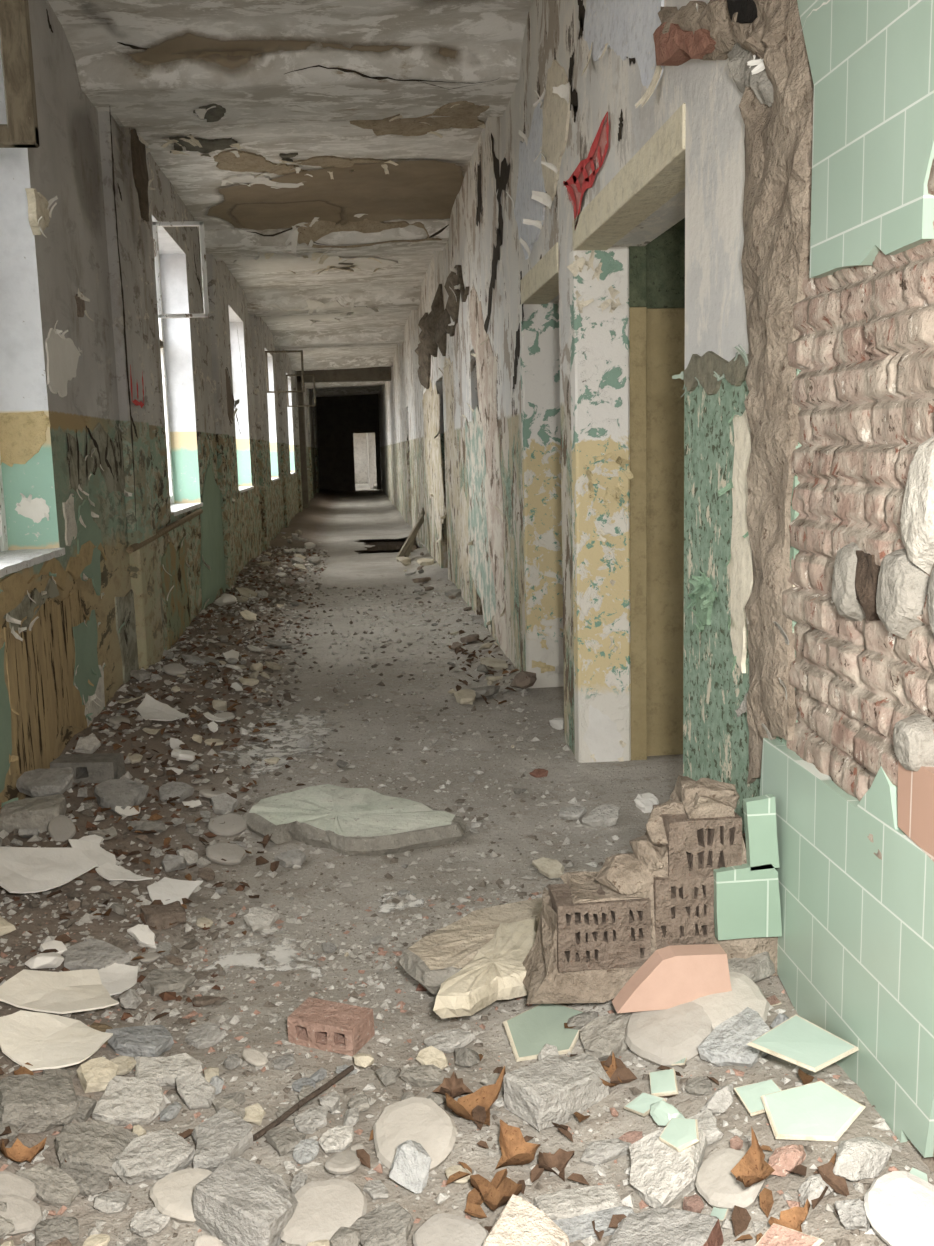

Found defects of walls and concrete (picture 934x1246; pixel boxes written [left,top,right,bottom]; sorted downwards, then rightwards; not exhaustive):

crack [285,65,499,90]
spalling [192,103,226,122]
spalling [350,101,489,138]
spalling [131,129,398,222]
spalling [25,188,58,238]
spalling [234,214,442,274]
peeling [45,320,82,397]
spalling [225,369,240,424]
spalling [506,0,814,784]
peeling [0,411,50,467]
peeling [160,464,235,650]
spalling [855,550,880,621]